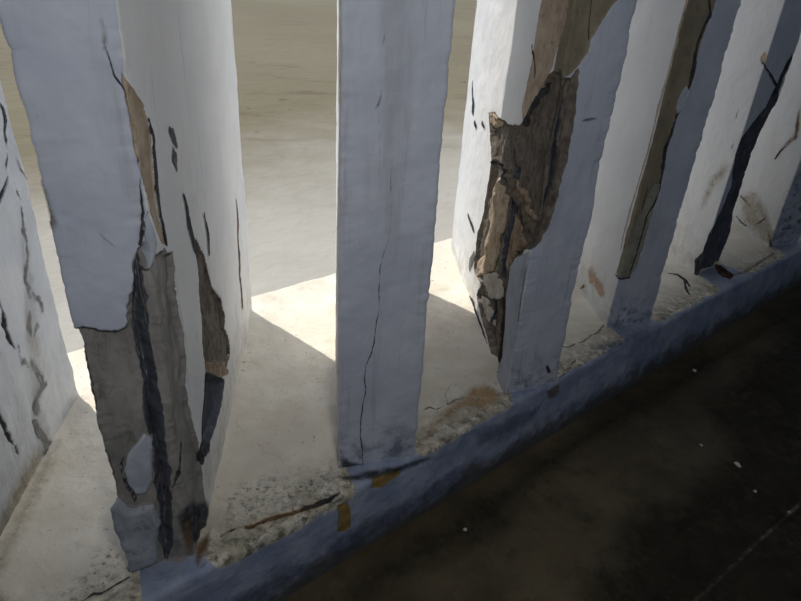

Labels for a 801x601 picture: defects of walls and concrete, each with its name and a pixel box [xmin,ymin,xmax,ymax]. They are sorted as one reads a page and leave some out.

crack [0,103,52,455]
spalling [74,46,230,574]
crack [360,251,385,459]
spalling [469,0,618,393]
spalling [617,0,716,277]
crack [669,273,691,295]
spalling [694,89,779,275]
crack [222,494,338,536]